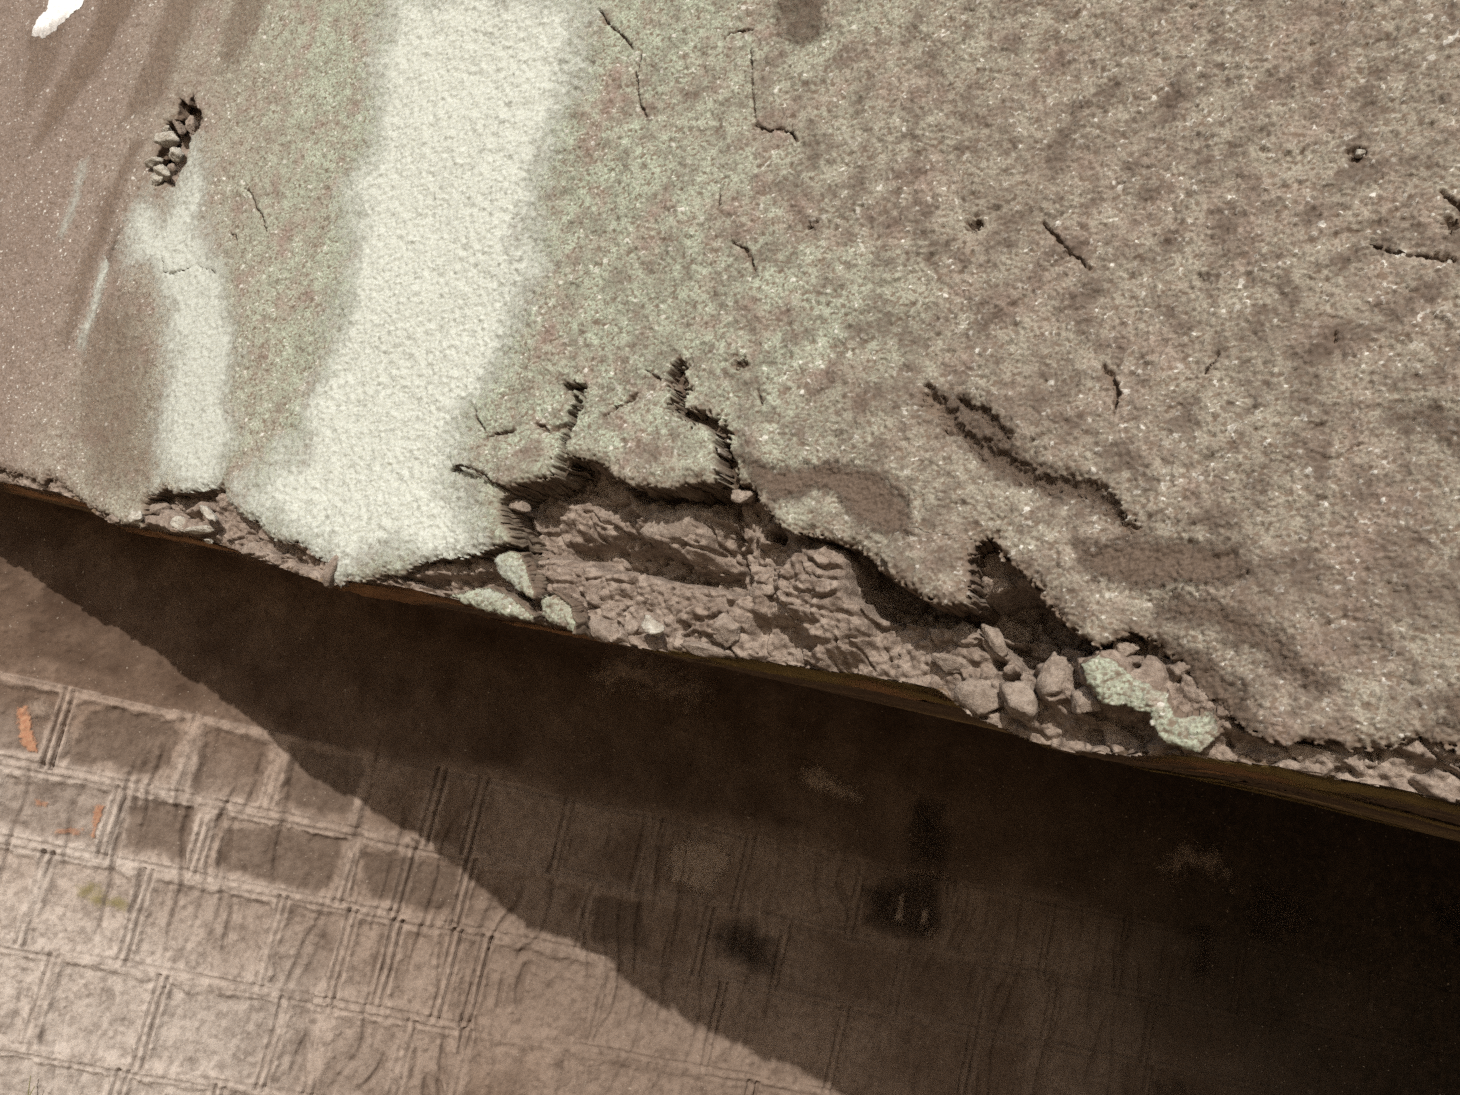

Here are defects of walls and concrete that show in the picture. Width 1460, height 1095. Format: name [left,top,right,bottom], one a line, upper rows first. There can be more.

spalling [144,108,203,186]
crack [1104,370,1121,411]
crack [453,369,740,492]
crack [933,398,1125,524]
spalling [0,383,1460,804]
leakage [652,650,960,708]
leakage [1139,755,1460,830]
leakage [871,880,938,931]